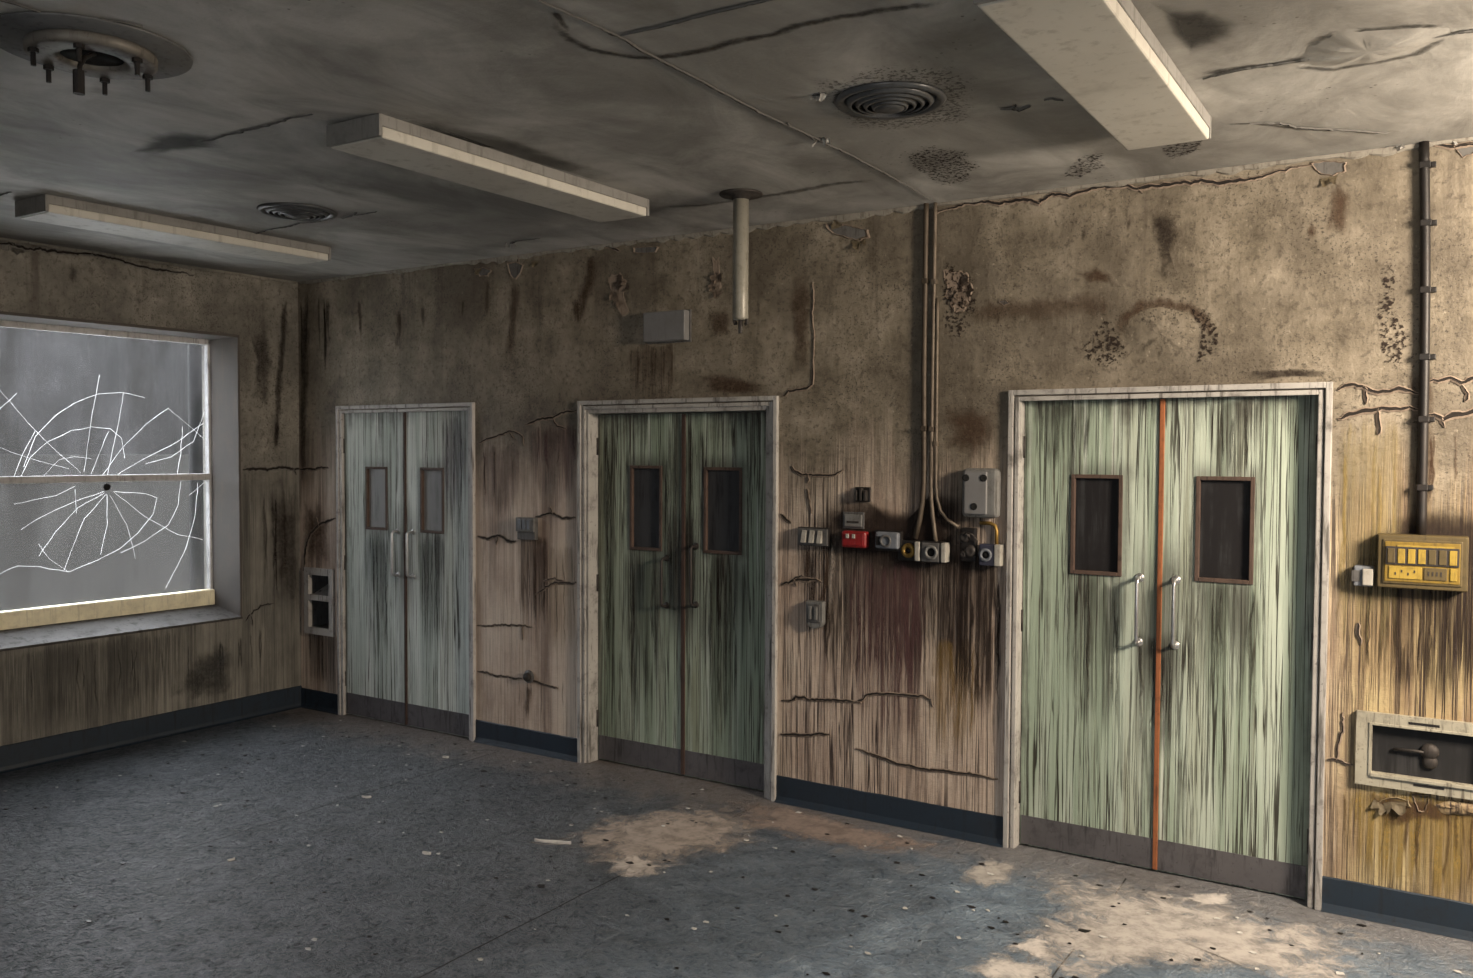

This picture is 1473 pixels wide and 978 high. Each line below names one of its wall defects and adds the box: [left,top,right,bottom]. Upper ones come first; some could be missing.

crack [0,375,204,587]